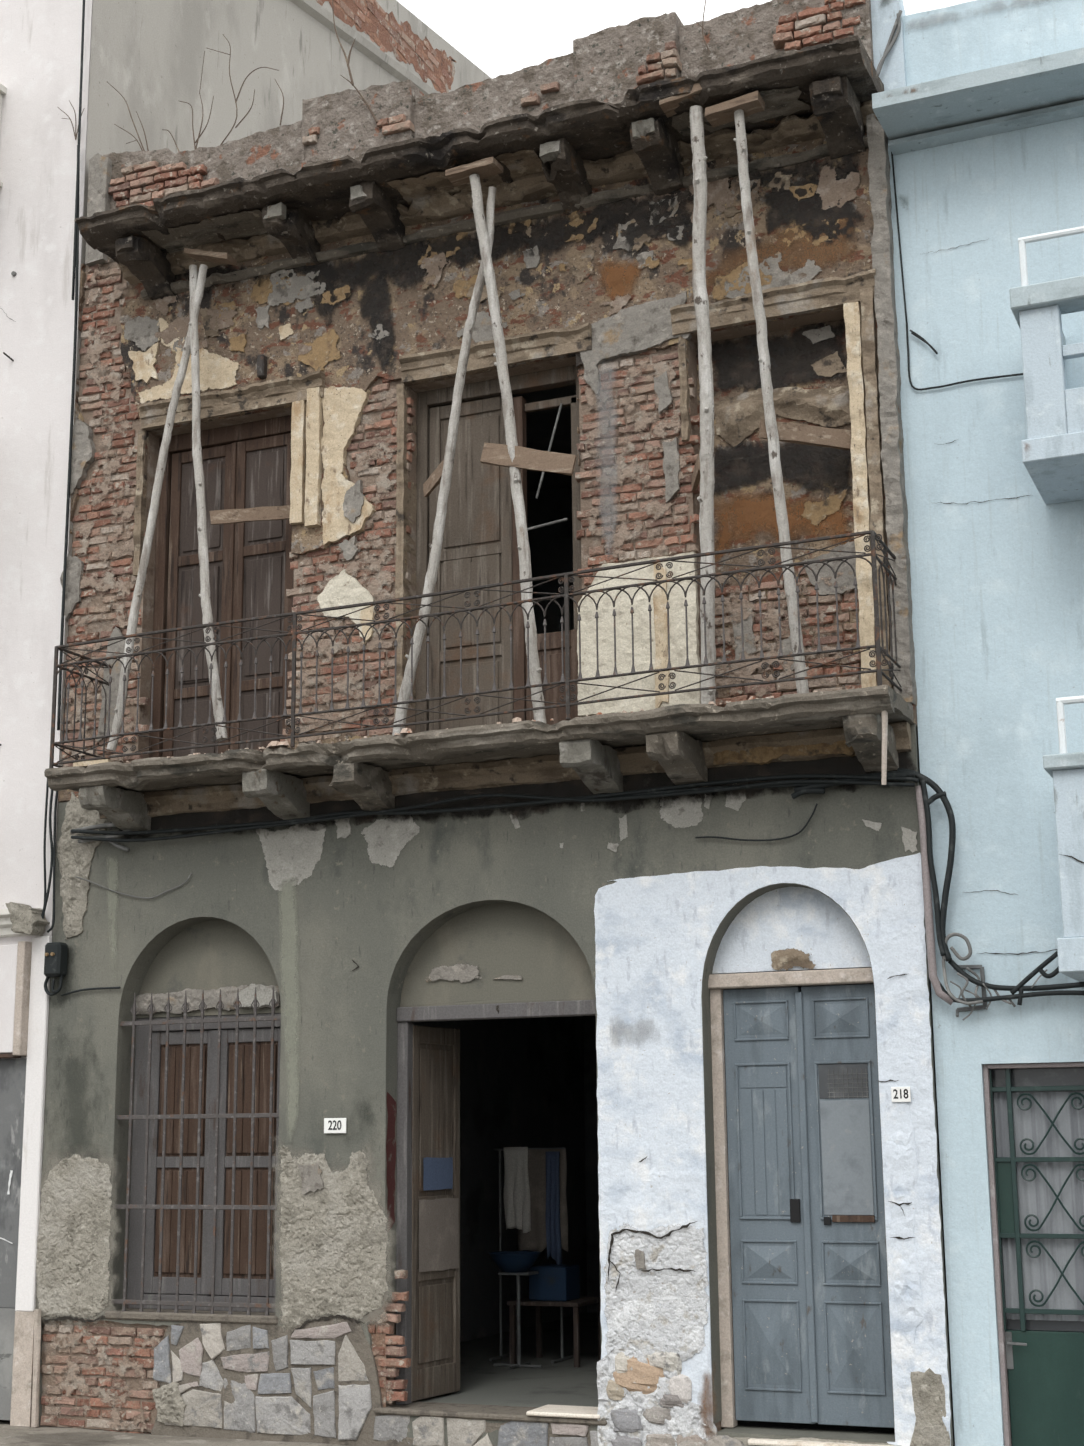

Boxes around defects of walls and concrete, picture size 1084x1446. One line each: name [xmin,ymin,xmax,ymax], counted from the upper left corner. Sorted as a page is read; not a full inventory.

flaking render [108,161,219,208]
damp [304,263,341,327]
peeling [613,164,860,300]
flaking render [60,257,351,767]
flaking render [280,378,416,742]
flaking render [575,291,862,717]
spalling [5,792,111,940]
peeling [255,816,420,891]
spalling [36,1152,187,1434]
spalling [275,1092,411,1407]
spalling [603,1223,710,1361]
spalling [910,1368,950,1446]